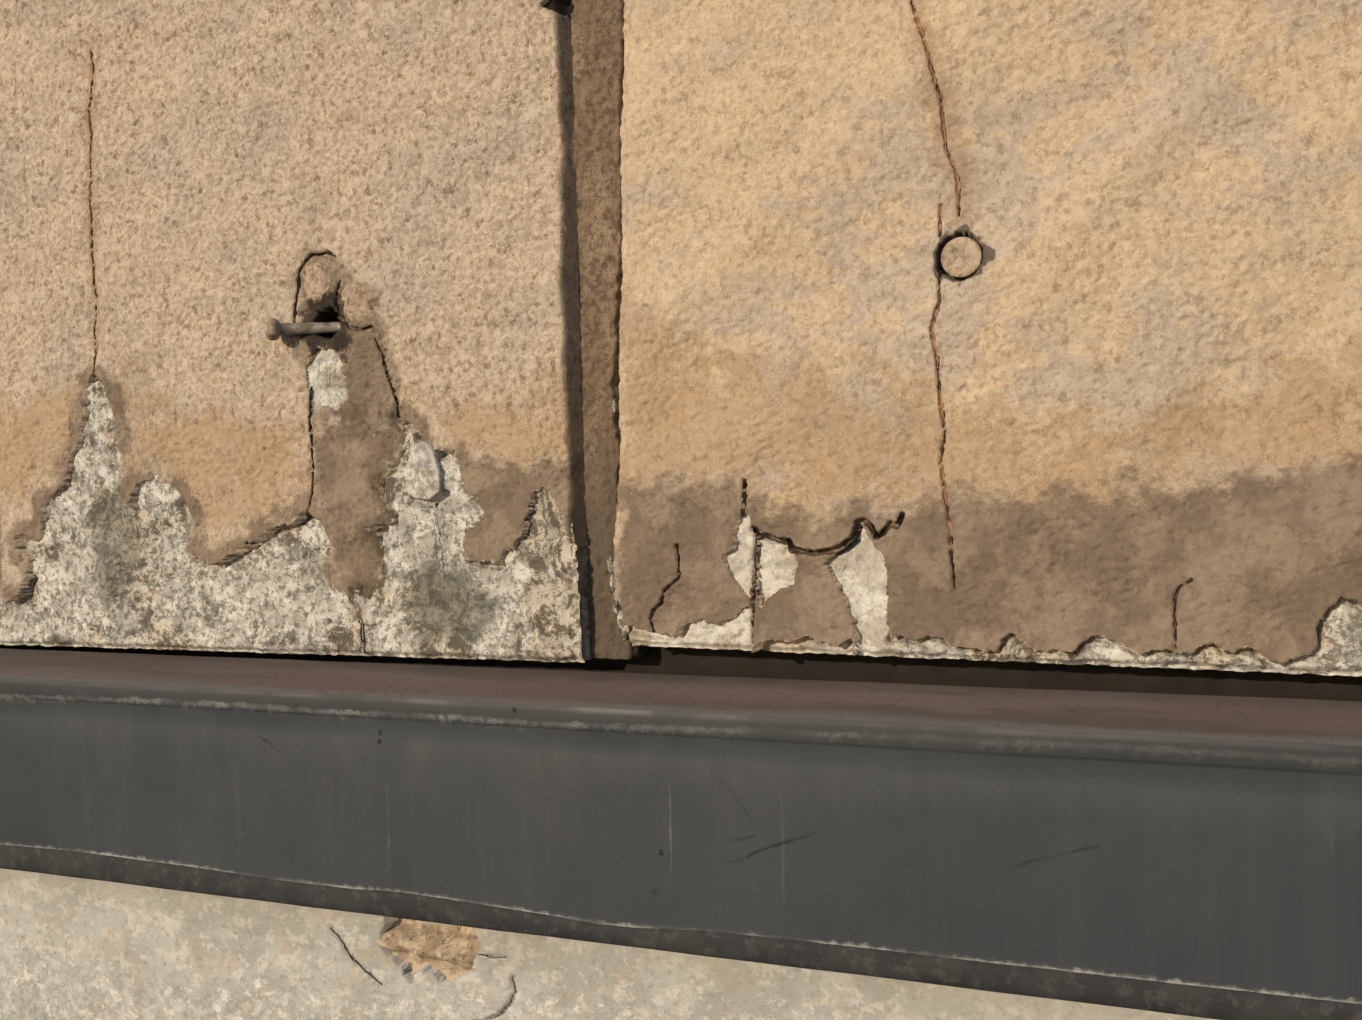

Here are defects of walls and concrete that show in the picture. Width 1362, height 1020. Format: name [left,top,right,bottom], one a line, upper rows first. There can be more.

crack [910,0,961,236]
crack [88,51,98,378]
spalling [0,381,585,663]
crack [306,387,315,512]
spalling [307,348,349,410]
crack [293,252,400,418]
crack [649,544,680,632]
crack [741,479,903,643]
crack [929,271,955,588]
spalling [607,509,1362,677]
crack [1173,580,1192,647]